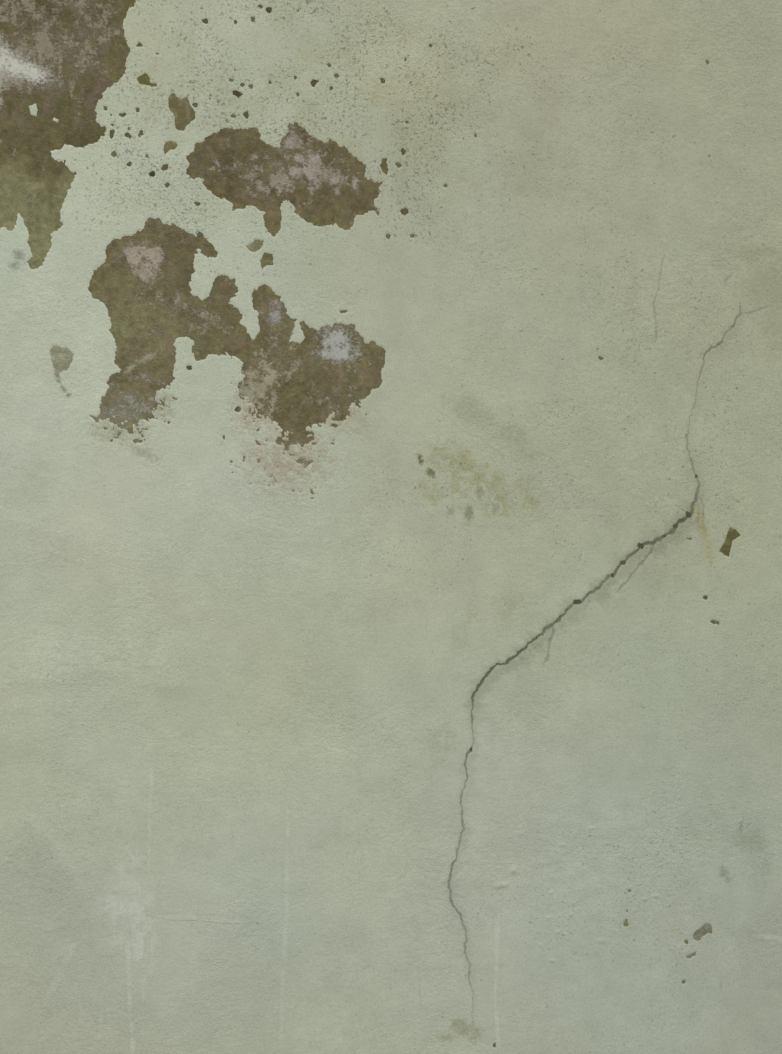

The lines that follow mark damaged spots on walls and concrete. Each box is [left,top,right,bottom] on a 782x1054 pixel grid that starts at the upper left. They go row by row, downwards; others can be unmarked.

peeling [0,0,157,273]
peeling [149,93,198,188]
peeling [186,112,406,270]
peeling [74,217,386,510]
crack [611,511,692,577]
peeling [719,527,740,556]
crack [472,599,582,698]